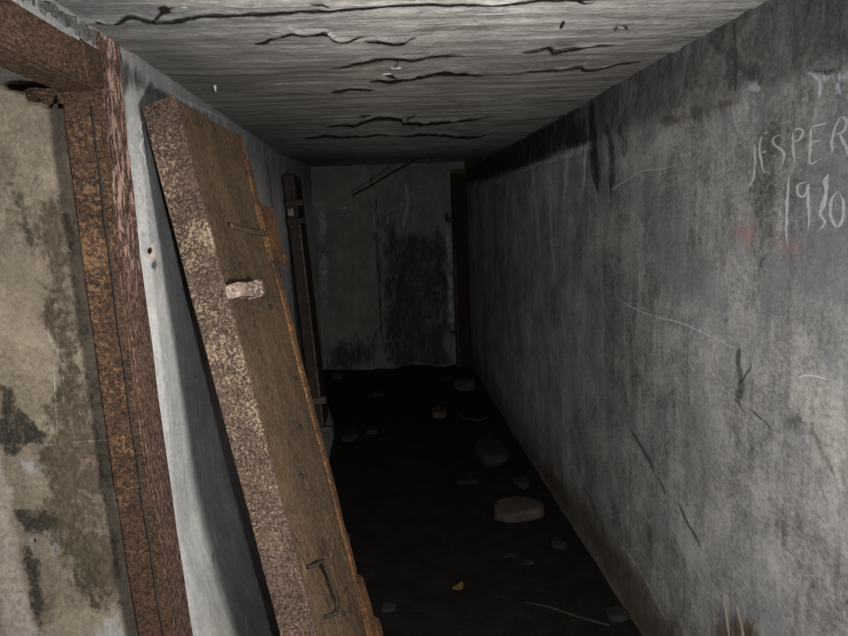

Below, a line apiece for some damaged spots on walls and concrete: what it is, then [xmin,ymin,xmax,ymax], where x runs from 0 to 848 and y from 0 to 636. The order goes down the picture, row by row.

crack [82,0,654,93]
efflorescence [808,72,848,98]
crack [303,112,500,139]
leakage [383,227,450,366]
leakage [0,200,120,608]
leakage [24,546,43,626]
rust [720,593,753,636]